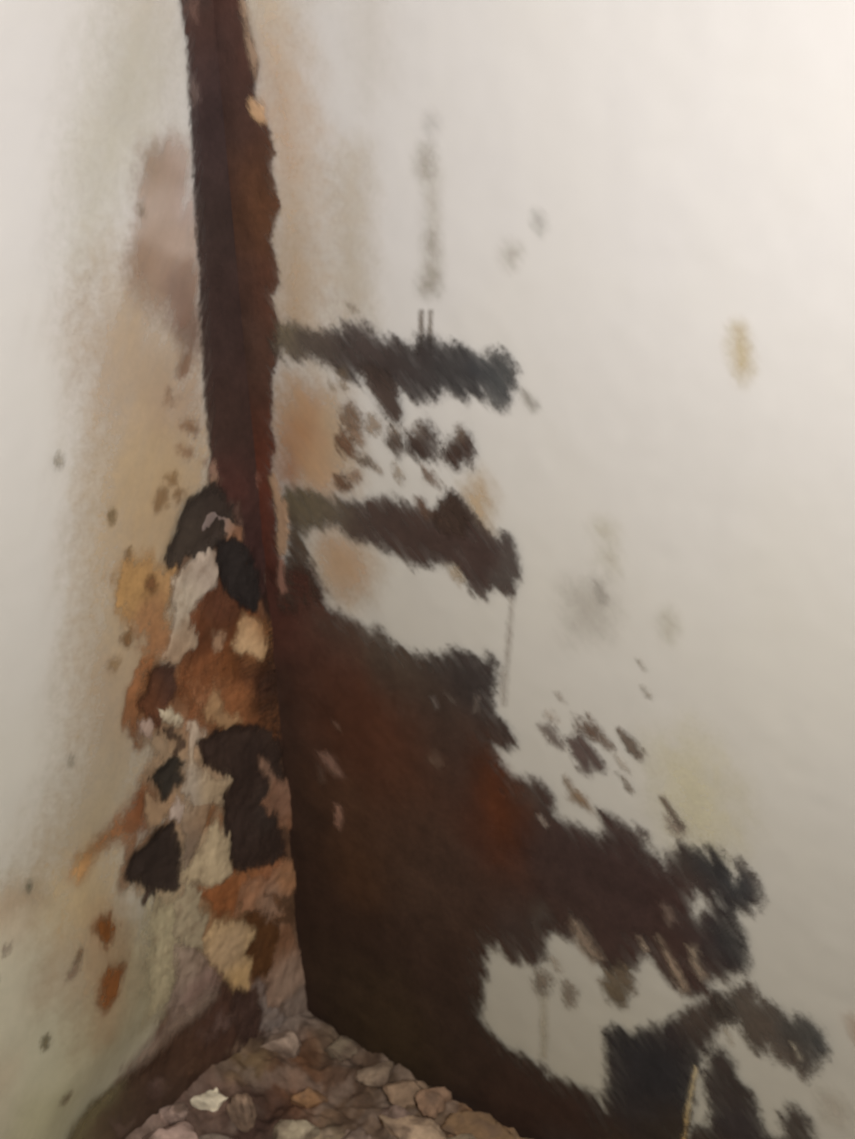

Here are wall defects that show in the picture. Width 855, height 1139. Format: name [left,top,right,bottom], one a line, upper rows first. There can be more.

leakage [72,984,264,1139]
spalling [115,462,307,1087]
leakage [54,0,521,1001]
leakage [265,566,829,1139]